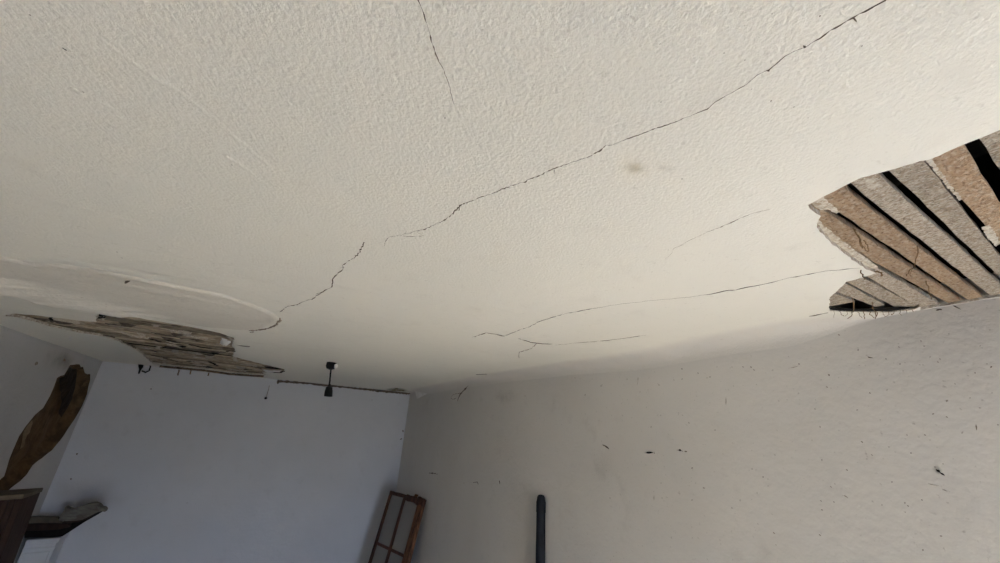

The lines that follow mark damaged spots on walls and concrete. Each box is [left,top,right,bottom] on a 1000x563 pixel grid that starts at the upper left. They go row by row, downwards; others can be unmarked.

crack [280,0,886,312]
flaking render [979,130,1000,169]
flaking render [811,144,1000,319]
flaking render [19,314,285,377]
crack [475,268,854,353]